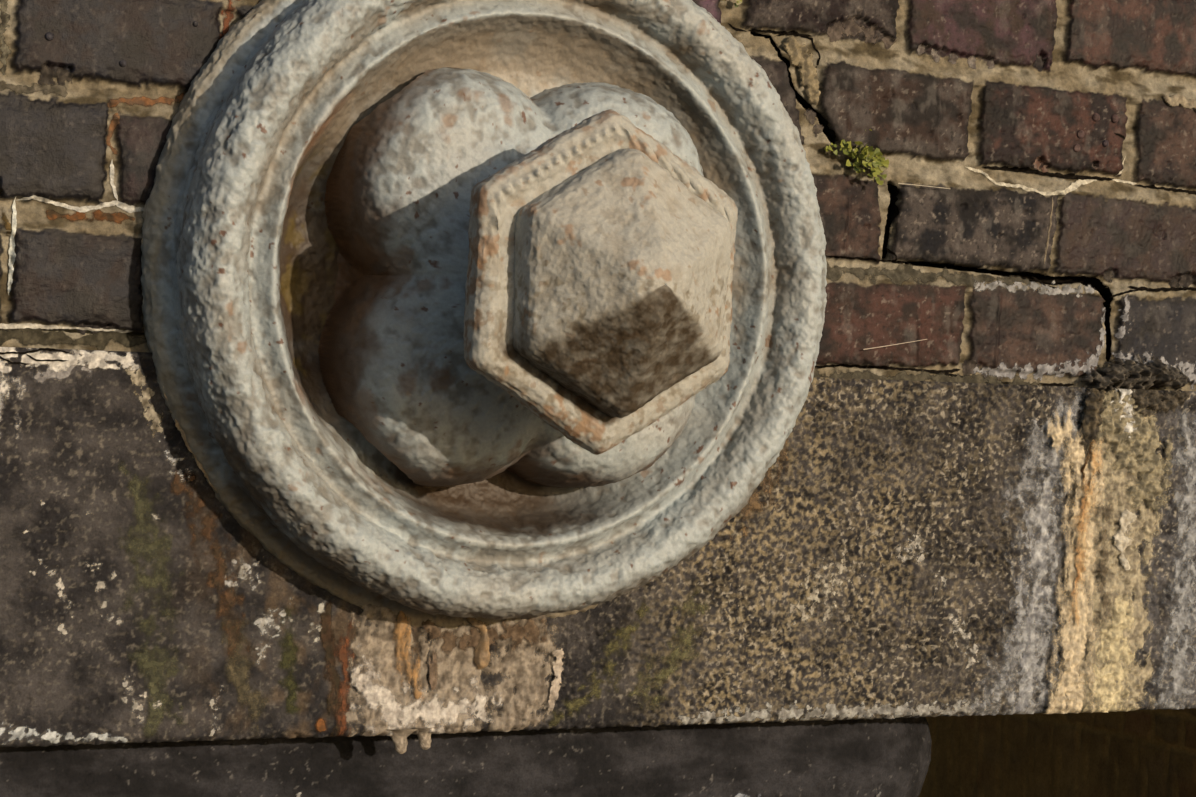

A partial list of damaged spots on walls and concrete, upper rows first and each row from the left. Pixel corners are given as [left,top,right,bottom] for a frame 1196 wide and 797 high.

damp [0,0,68,97]
damp [826,261,1095,297]
crack [827,184,1144,361]
damp [0,328,181,437]
damp [678,294,1196,725]